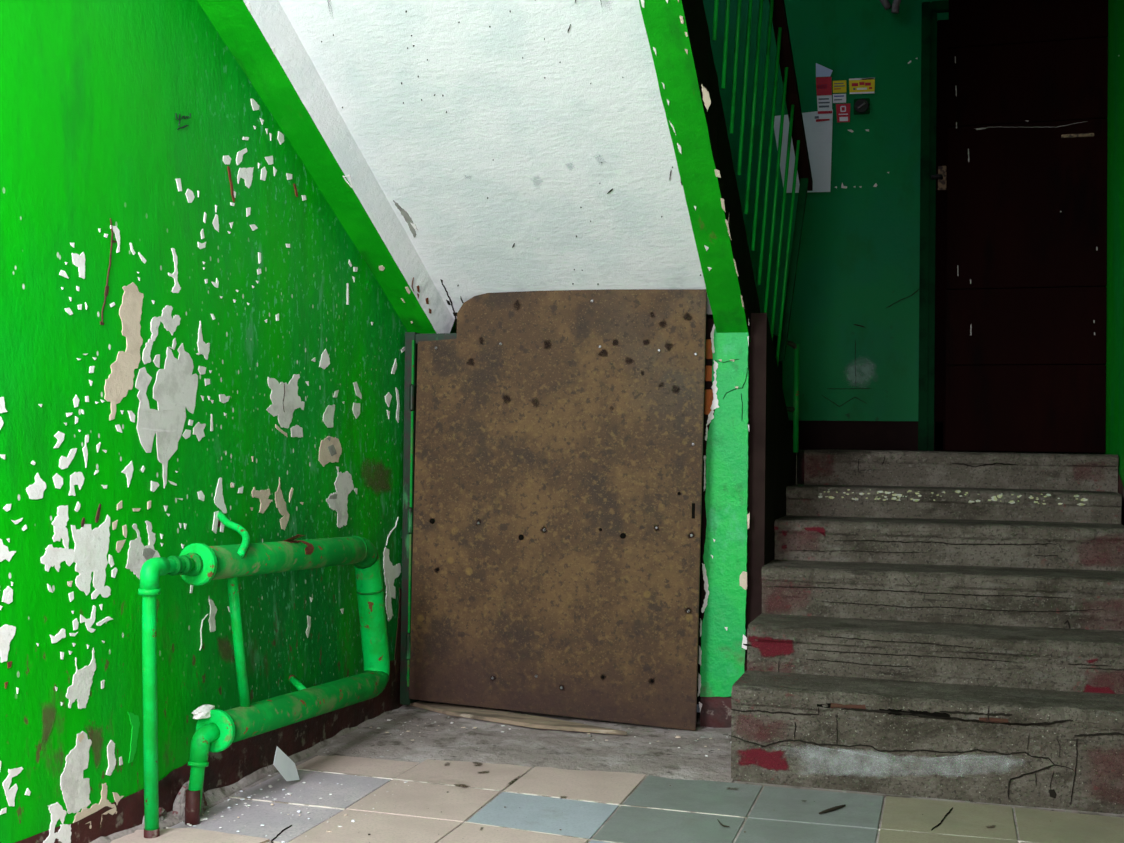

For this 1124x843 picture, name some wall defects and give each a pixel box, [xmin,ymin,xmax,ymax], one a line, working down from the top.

peeling [176,178,199,203]
peeling [198,99,292,305]
peeling [266,374,309,438]
peeling [26,225,230,709]
peeling [318,382,362,528]
peeling [197,477,304,534]
peeling [0,538,16,562]
peeling [0,582,13,610]
peeling [0,624,16,668]
peeling [0,761,31,815]
peeling [43,731,124,843]
crack [729,707,1124,805]